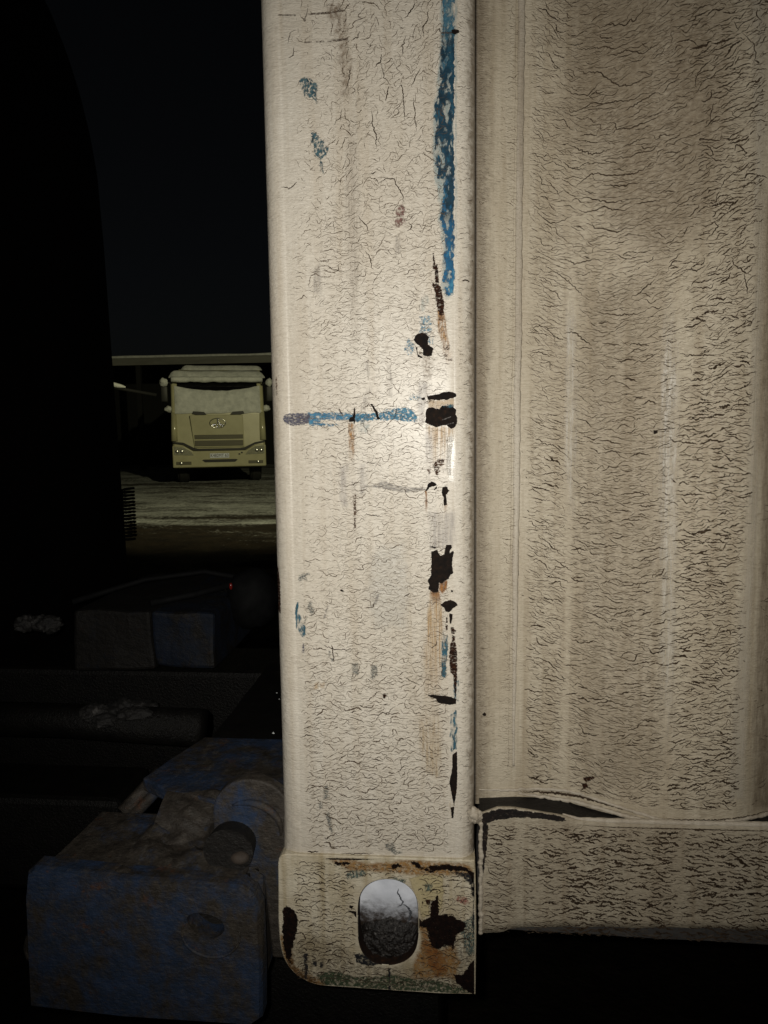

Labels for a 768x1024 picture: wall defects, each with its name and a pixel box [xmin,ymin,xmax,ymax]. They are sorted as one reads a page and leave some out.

peeling [410,391,457,429]
peeling [425,482,449,506]
crack [281,0,768,990]
peeling [428,545,457,642]
corrosion [428,581,458,697]
peeling [428,694,457,705]
peeling [419,891,466,950]
corrosion [414,927,474,994]